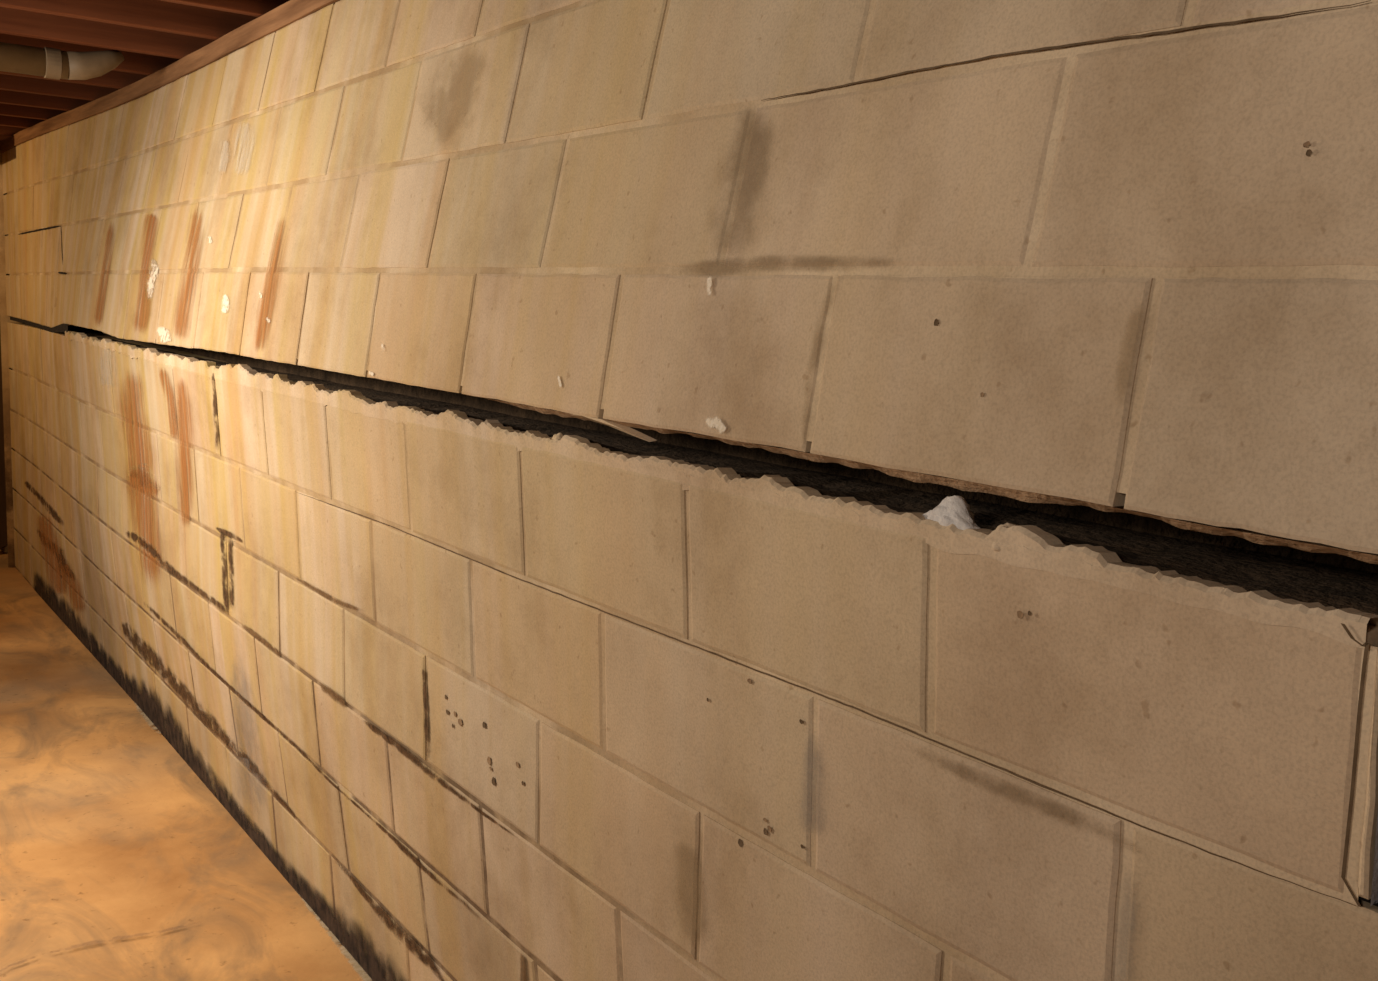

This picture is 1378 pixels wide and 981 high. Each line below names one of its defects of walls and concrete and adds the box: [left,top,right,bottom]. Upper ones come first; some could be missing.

crack [18,226,66,274]
corrosion [135,214,156,328]
corrosion [175,217,200,336]
corrosion [256,224,283,346]
corrosion [120,376,158,575]
corrosion [160,370,191,521]
leakage [127,527,241,611]
crack [10,316,1378,907]
leakage [34,574,402,981]
leakage [150,608,467,907]
leakage [365,670,510,833]
leakage [339,865,444,981]